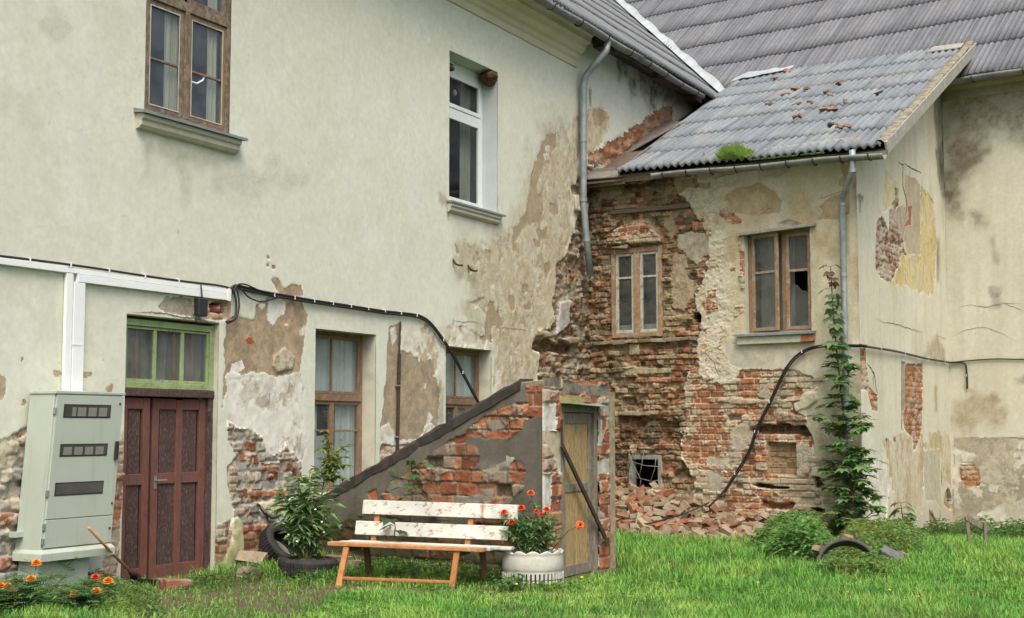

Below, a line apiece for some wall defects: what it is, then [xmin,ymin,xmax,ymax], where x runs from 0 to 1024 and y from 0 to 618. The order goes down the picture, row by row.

spalling [368,105,833,515]
flaking render [818,162,857,221]
peeling [875,171,937,297]
damp [934,90,1024,207]
spalling [0,427,27,583]
flaking render [159,255,308,570]
flaking render [868,361,980,525]